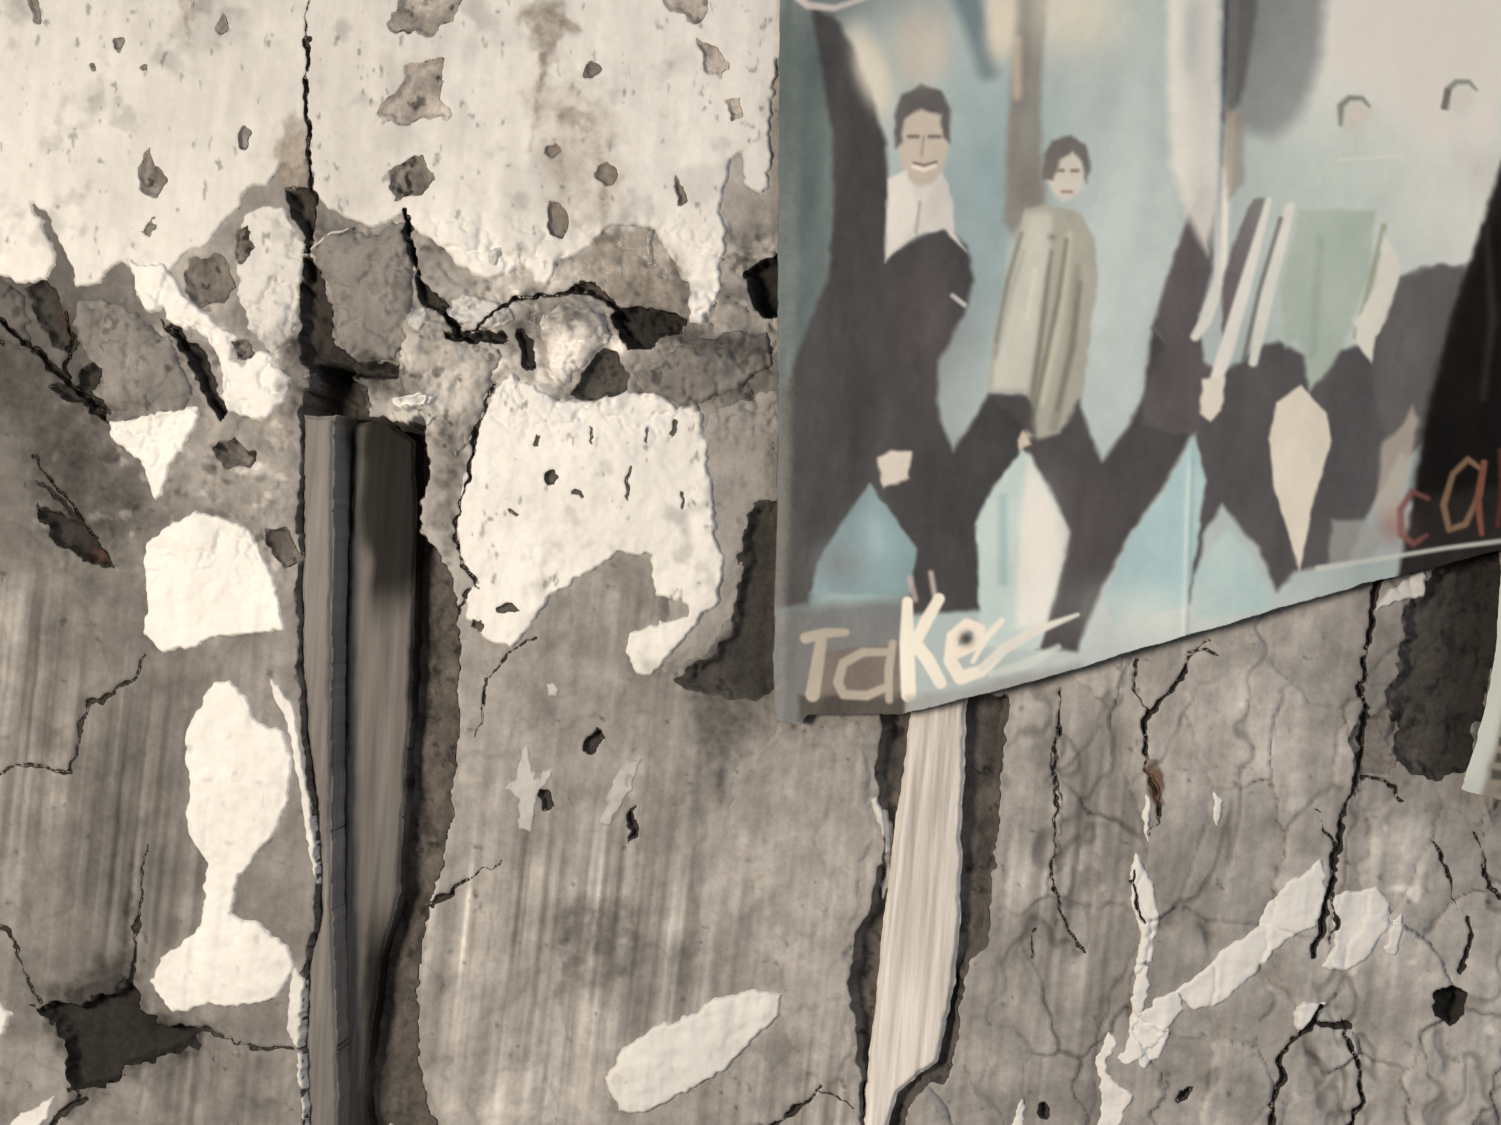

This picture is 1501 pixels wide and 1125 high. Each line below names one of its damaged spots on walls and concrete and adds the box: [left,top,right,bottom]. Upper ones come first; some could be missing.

crack [302,0,318,254]
crack [0,311,109,423]
crack [401,208,631,344]
peeling [0,0,783,1125]
crack [0,654,146,775]
crack [1030,689,1086,958]
crack [1132,639,1219,836]
peeling [1095,792,1402,1125]
crack [1311,579,1404,959]
crack [1432,831,1501,975]
peeling [1012,1099,1049,1125]
crack [1268,1004,1365,1125]